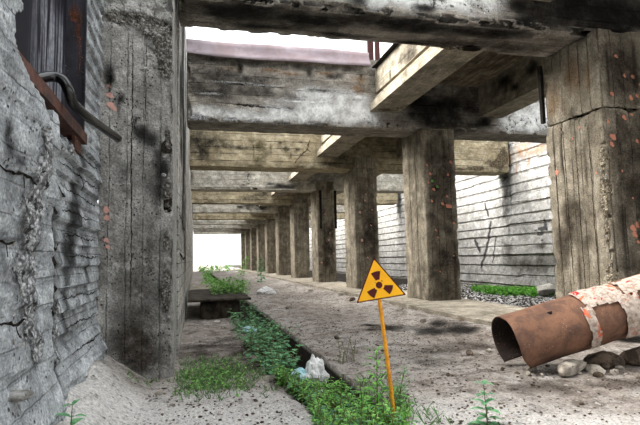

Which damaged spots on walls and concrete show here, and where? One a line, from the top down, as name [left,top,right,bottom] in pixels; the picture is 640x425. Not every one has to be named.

crack [52,154,98,267]
damp [430,146,458,287]
crack [460,106,637,296]
crack [0,319,25,338]
crack [51,285,97,338]
damp [114,308,159,372]